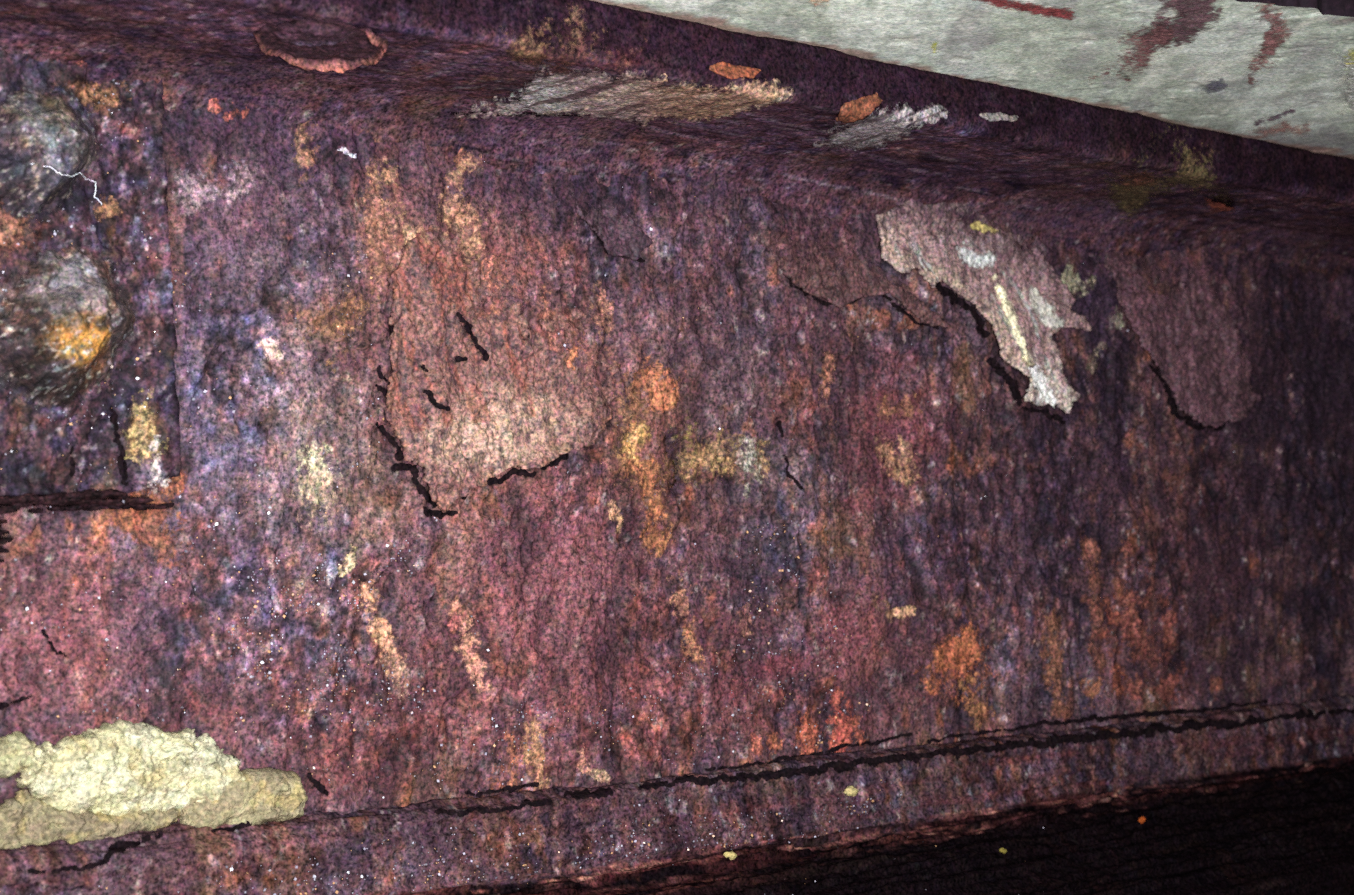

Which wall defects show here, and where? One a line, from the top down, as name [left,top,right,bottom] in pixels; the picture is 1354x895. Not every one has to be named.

peeling [455,65,794,132]
peeling [813,103,947,151]
crack [375,312,569,520]
rust [312,148,770,584]
crack [776,420,803,489]
rust [744,198,1092,414]
crack [783,258,1066,425]
rust [1103,247,1261,428]
crack [1149,364,1229,431]
rust [0,470,193,569]
rust [361,583,409,696]
rust [447,595,494,700]